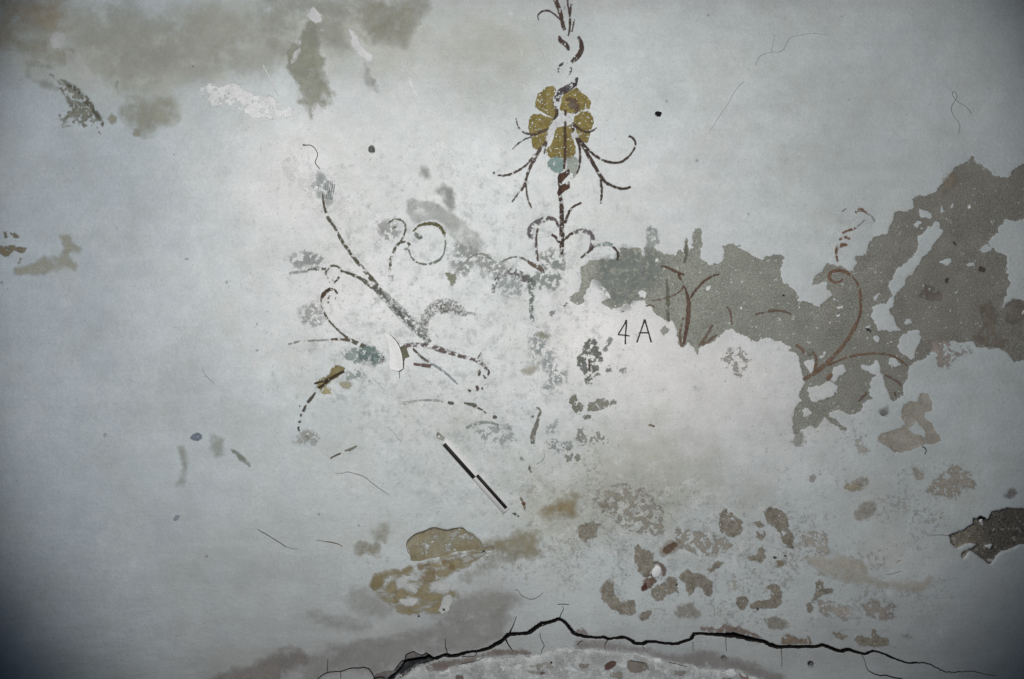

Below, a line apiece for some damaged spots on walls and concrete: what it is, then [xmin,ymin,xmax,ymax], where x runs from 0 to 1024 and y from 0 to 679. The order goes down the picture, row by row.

damp [362,0,423,43]
damp [271,2,347,109]
damp [42,74,116,133]
flaking render [549,156,1024,462]
peeling [578,484,829,628]
peeling [844,478,867,491]
peeling [855,503,876,520]
peeling [913,465,976,498]
spalling [949,490,1024,564]
crack [317,589,996,679]
peeling [806,580,896,647]